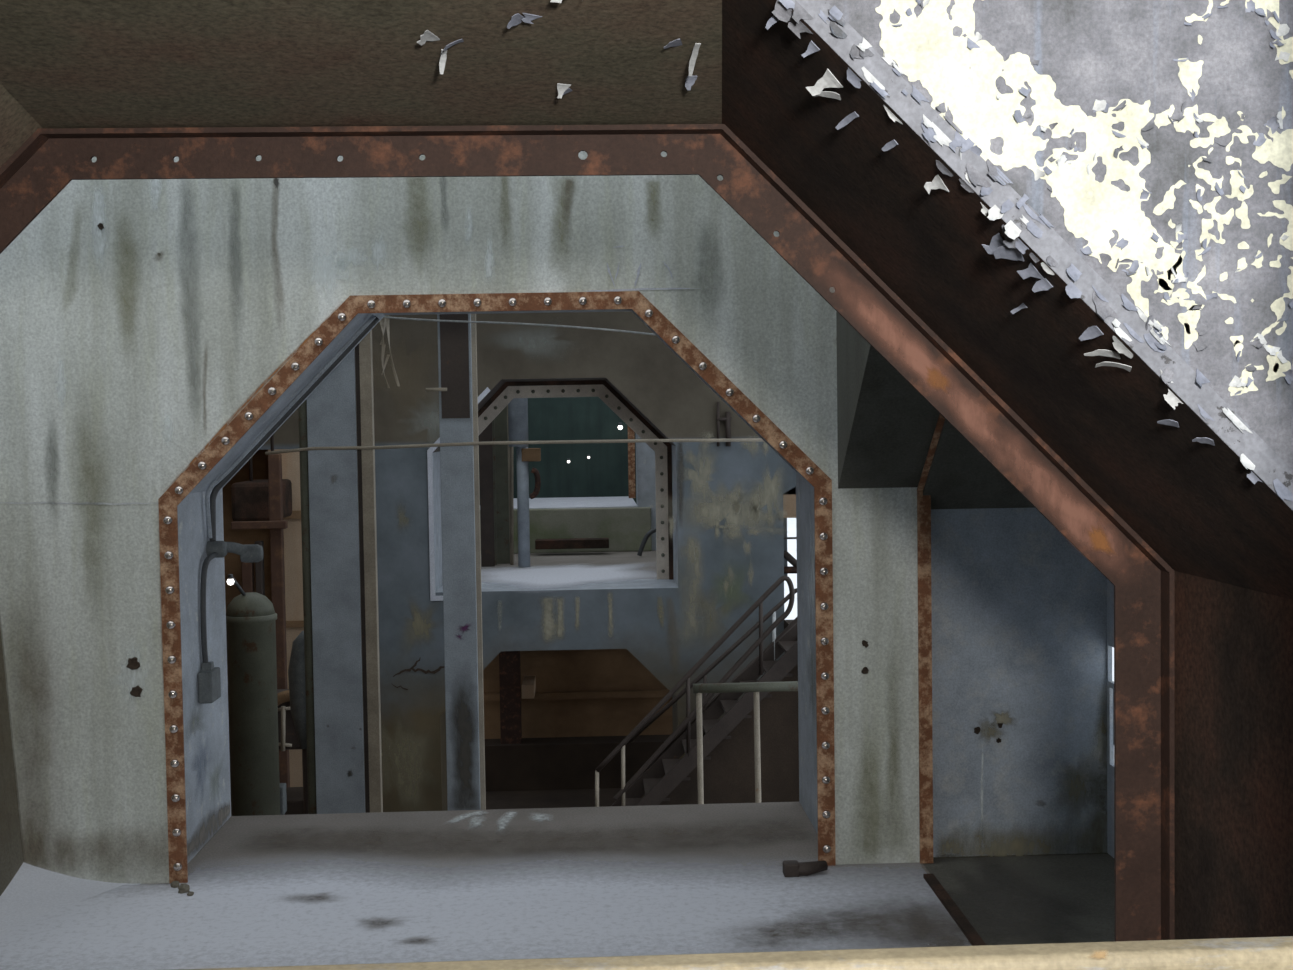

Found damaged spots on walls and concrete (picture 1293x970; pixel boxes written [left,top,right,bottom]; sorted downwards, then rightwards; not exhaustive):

peeling [507,13,542,29]
peeling [417,30,464,74]
peeling [664,39,701,90]
peeling [557,83,573,99]
peeling [765,0,1293,434]
leakage [232,193,240,301]
corrosion [174,310,336,482]
peeling [1192,437,1215,446]
peeling [688,434,783,553]
peeling [1240,454,1293,501]
leakage [543,597,580,640]
corrosion [454,690,475,809]